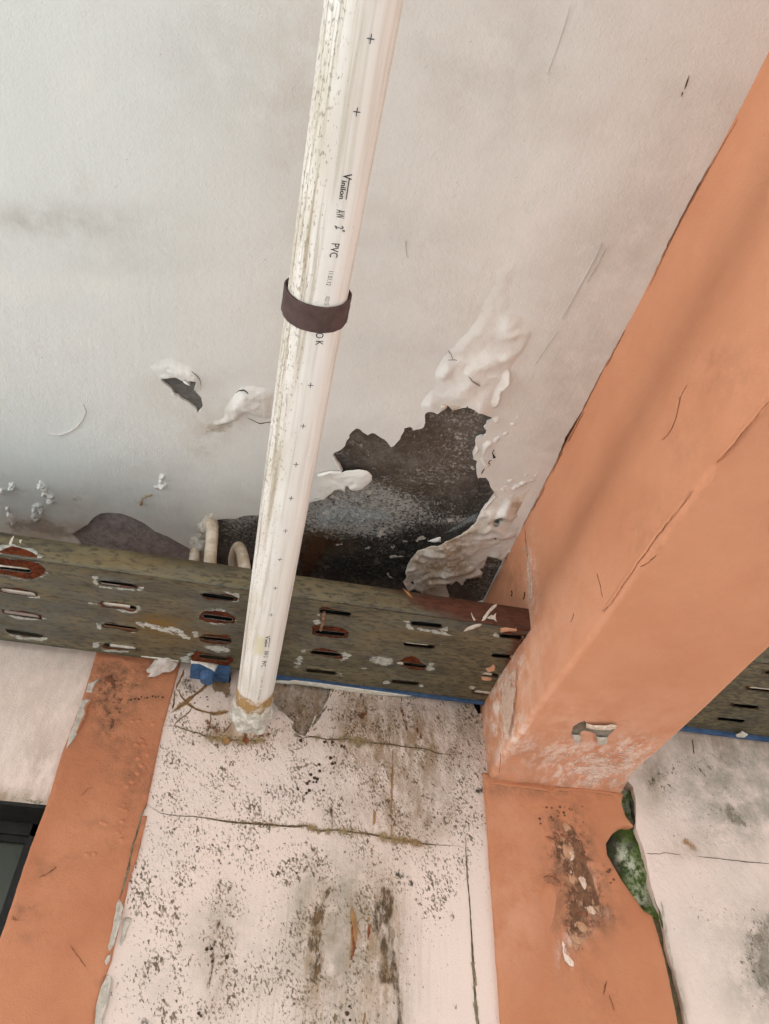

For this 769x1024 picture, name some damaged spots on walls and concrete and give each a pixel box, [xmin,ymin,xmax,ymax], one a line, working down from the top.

spalling [163,378,203,411]
corrosion [0,544,48,599]
spalling [216,515,259,569]
spalling [296,404,538,601]
crack [597,490,693,611]
corrosion [88,576,240,666]
corrosion [361,621,451,671]
water stain [182,679,273,714]
crack [300,735,457,755]
crack [119,805,479,1024]
water stain [308,888,330,993]
water stain [365,887,402,1024]